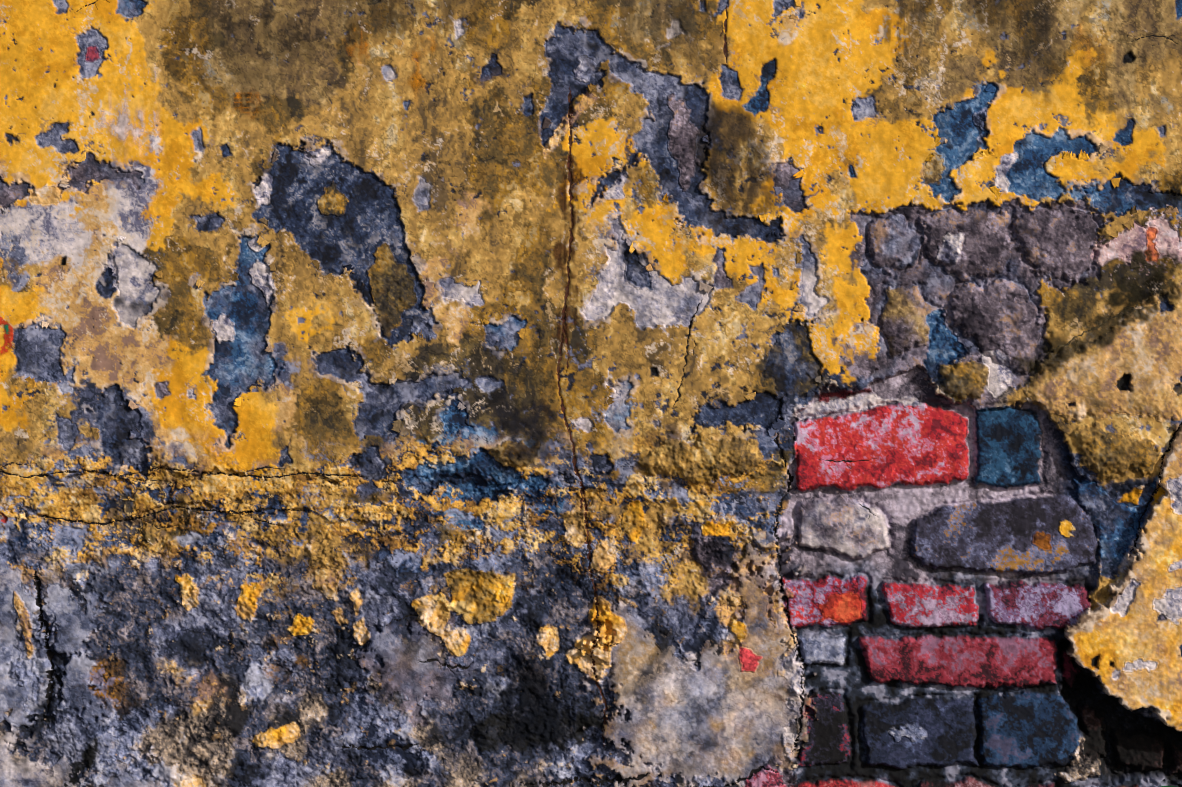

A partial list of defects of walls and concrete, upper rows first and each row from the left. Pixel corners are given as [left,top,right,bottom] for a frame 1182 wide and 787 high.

peeling [194,141,436,447]
corrosion [554,155,585,343]
peeling [523,20,782,330]
peeling [924,83,1134,202]
crack [33,571,63,712]
crack [0,462,368,529]
peeling [412,570,514,656]
peeling [538,598,626,680]
crack [556,87,618,746]
crack [693,396,807,787]
flaking render [691,235,1182,787]
crack [520,773,650,787]